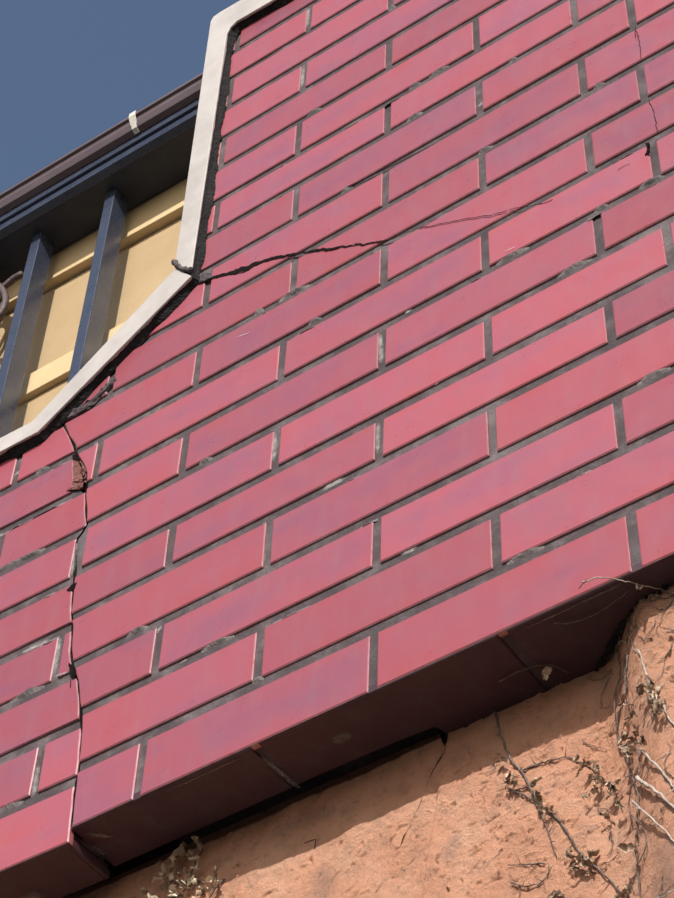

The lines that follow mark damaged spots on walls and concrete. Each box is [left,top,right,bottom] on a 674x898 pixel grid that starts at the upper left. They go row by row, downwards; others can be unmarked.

crack [619,102,657,169]
crack [198,199,553,284]
crack [62,423,88,824]
crack [400,729,448,846]